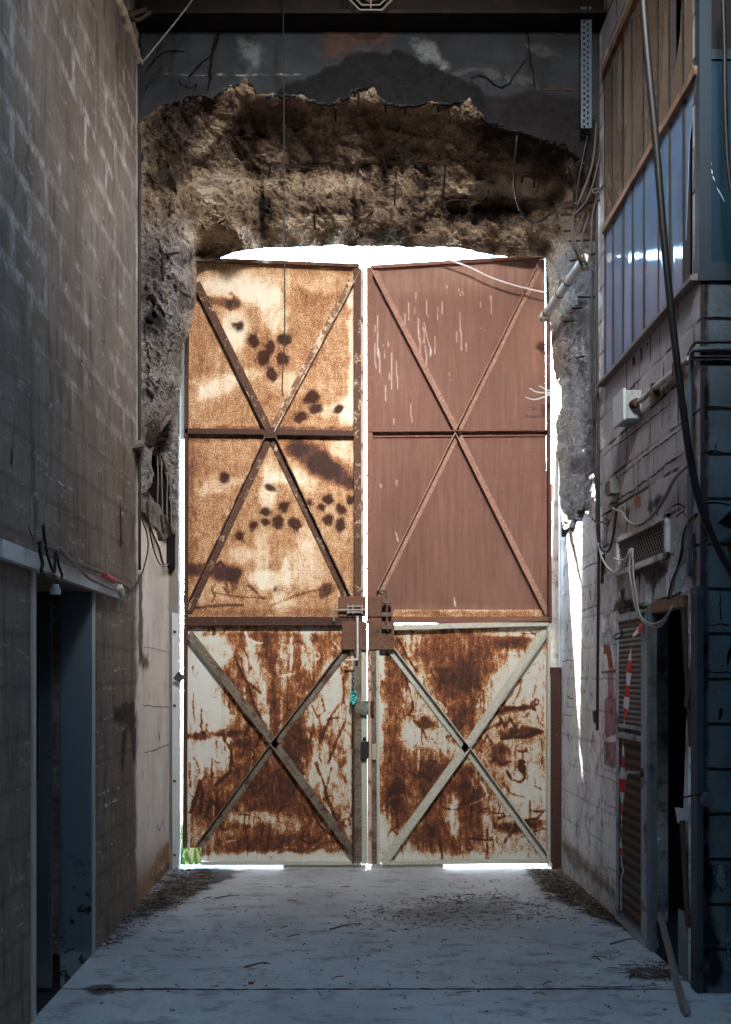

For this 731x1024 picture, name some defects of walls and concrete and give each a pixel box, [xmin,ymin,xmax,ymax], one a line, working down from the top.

spalling [132,79,600,568]